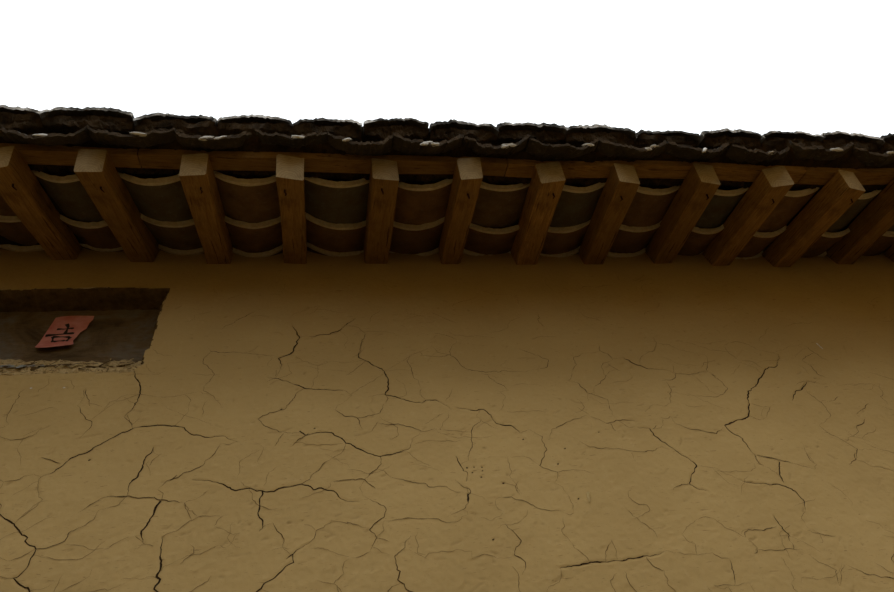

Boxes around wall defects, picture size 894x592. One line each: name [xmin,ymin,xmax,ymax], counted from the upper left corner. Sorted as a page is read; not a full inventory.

crack [0,300,894,592]